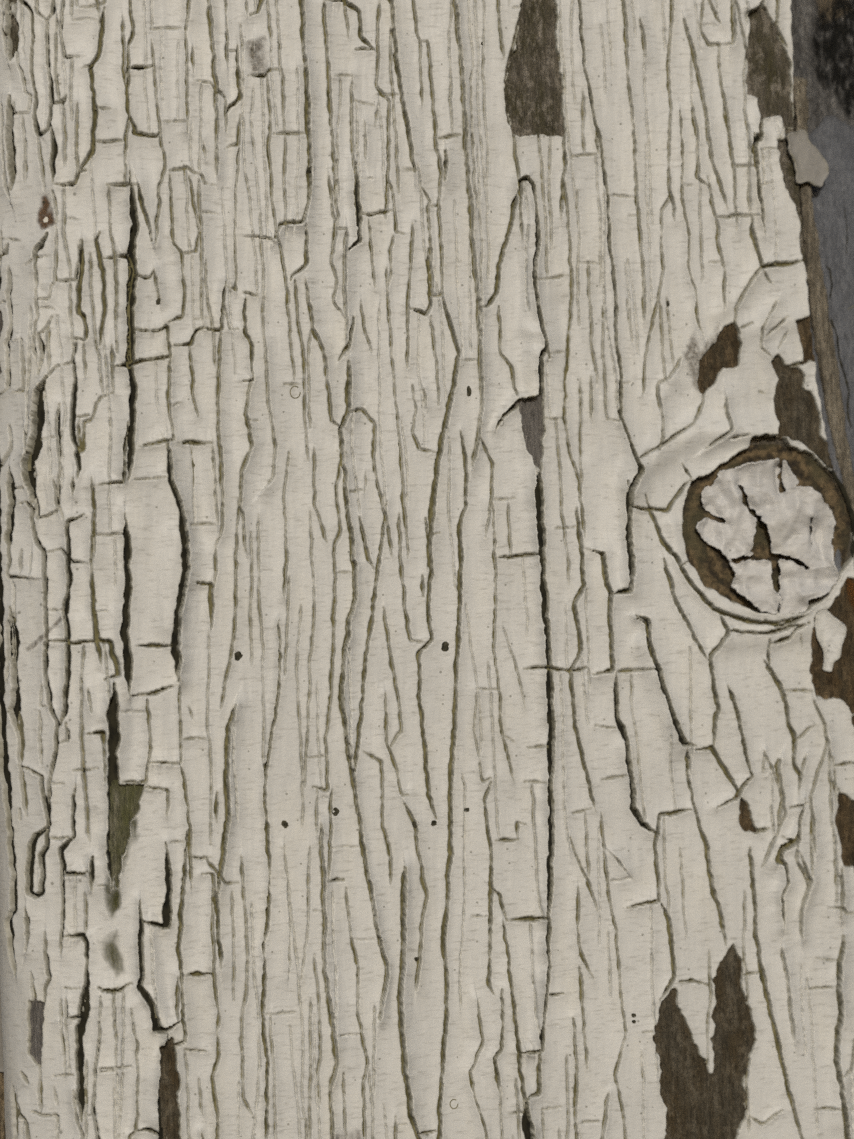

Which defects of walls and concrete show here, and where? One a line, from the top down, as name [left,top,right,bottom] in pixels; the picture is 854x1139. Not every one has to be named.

peeling [504,0,565,138]
crack [621,0,796,311]
peeling [740,0,829,265]
crack [642,362,678,407]
crack [826,207,852,428]
crack [0,0,670,1139]
peeling [627,316,854,726]
crack [809,449,854,558]
peeling [635,613,694,746]
peeling [736,795,759,832]
peeling [833,787,854,867]
peeling [653,945,755,1139]